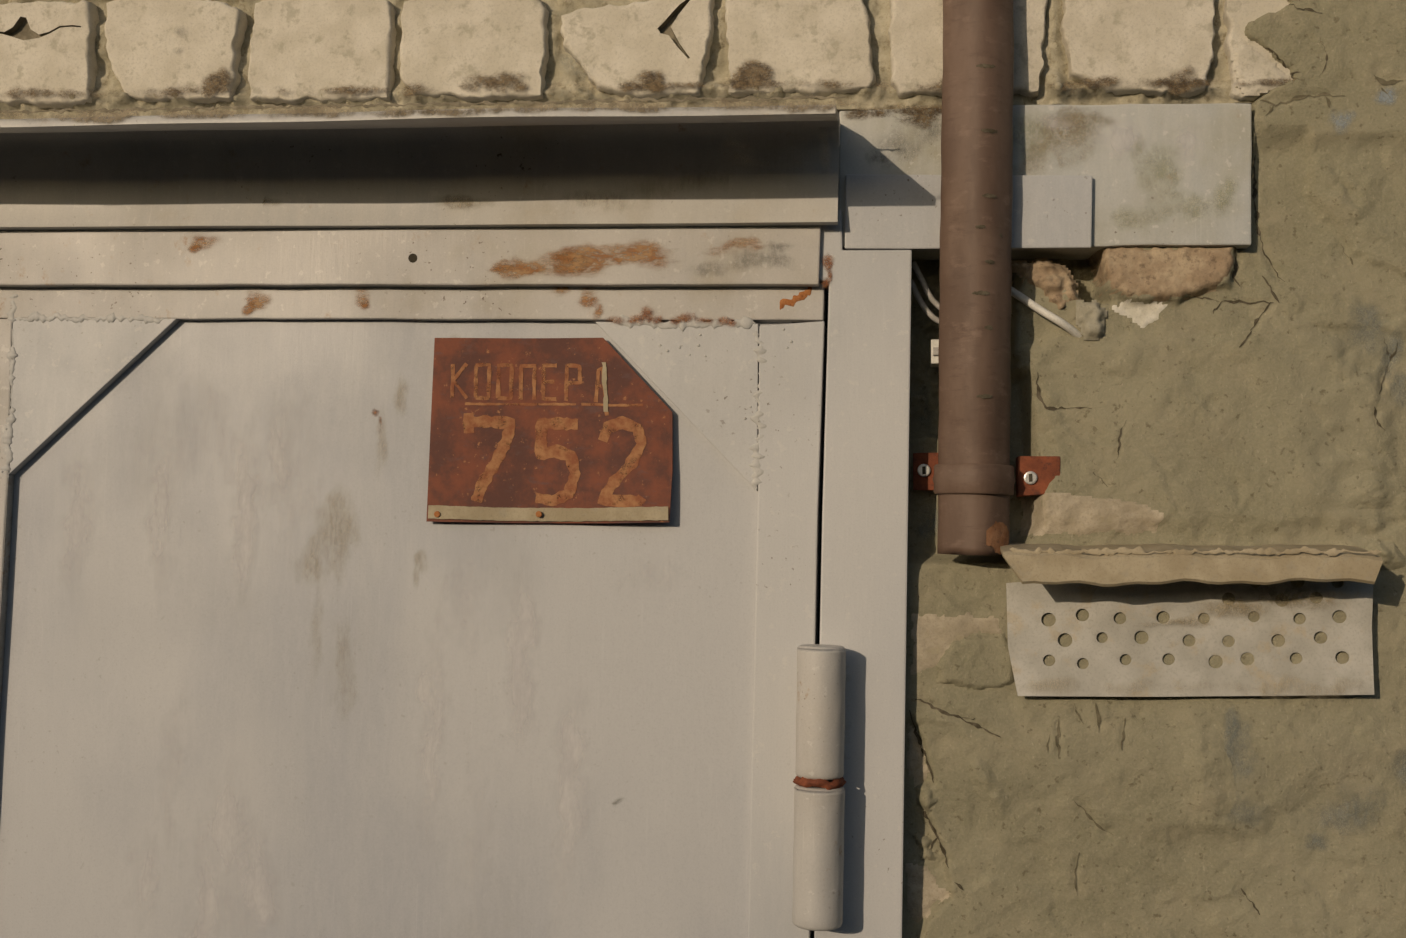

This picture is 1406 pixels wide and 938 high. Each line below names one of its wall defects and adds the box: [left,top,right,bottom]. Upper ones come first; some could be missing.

crack [0,17,81,40]
crack [657,0,690,59]
corrosion [189,237,211,252]
crack [1188,155,1285,348]
corrosion [243,296,268,315]
corrosion [495,243,734,326]
spalling [1011,258,1081,310]
crack [909,699,1000,890]